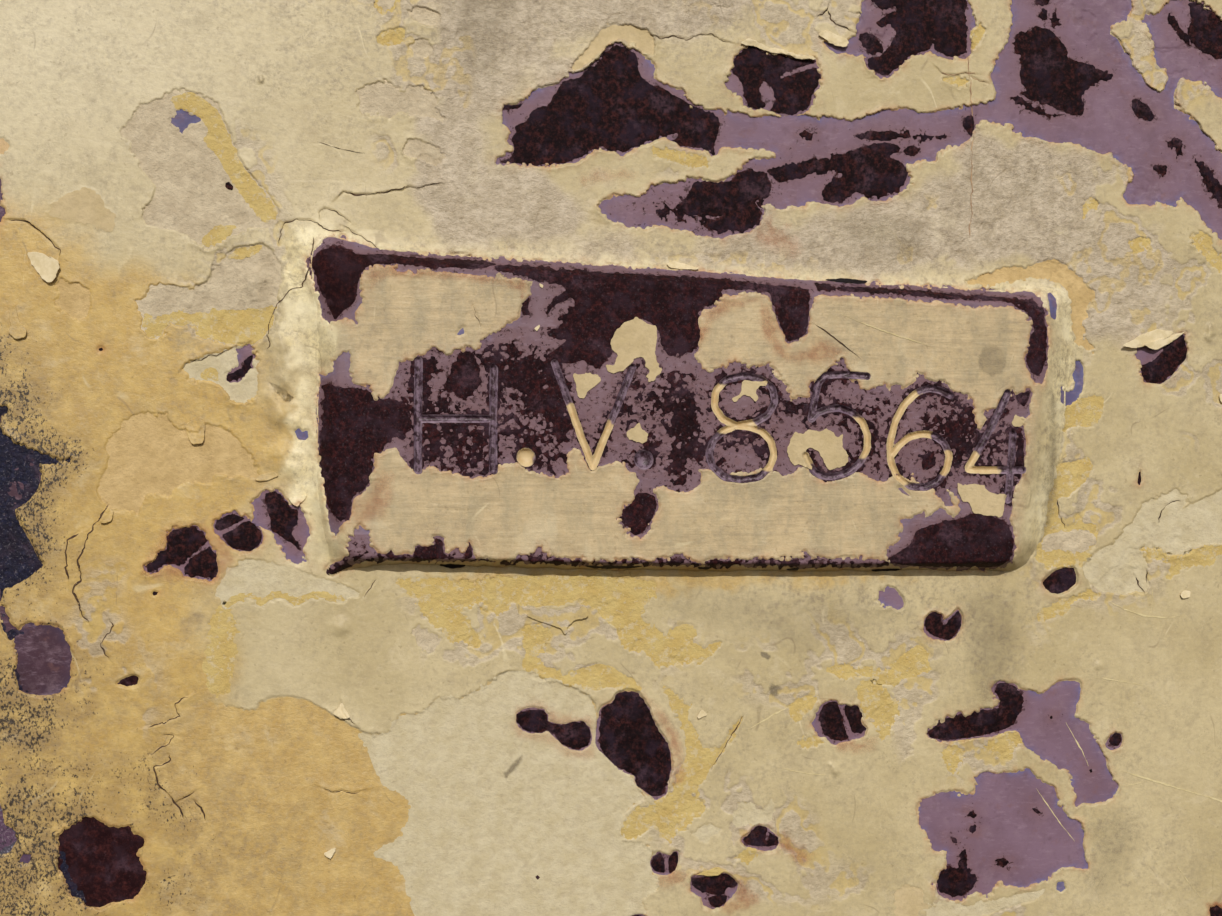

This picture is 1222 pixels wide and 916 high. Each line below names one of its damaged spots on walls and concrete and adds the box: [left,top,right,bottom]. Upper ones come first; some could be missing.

peeling [496,0,1222,273]
peeling [27,252,60,283]
peeling [120,88,282,403]
corrosion [1123,329,1187,384]
peeling [215,235,1095,669]
corrosion [923,610,962,641]
corrosion [57,817,147,907]
peeling [155,624,776,916]
corrosion [516,691,672,800]
corrosion [812,700,866,745]
peeling [826,645,933,741]
peeling [918,730,1088,916]